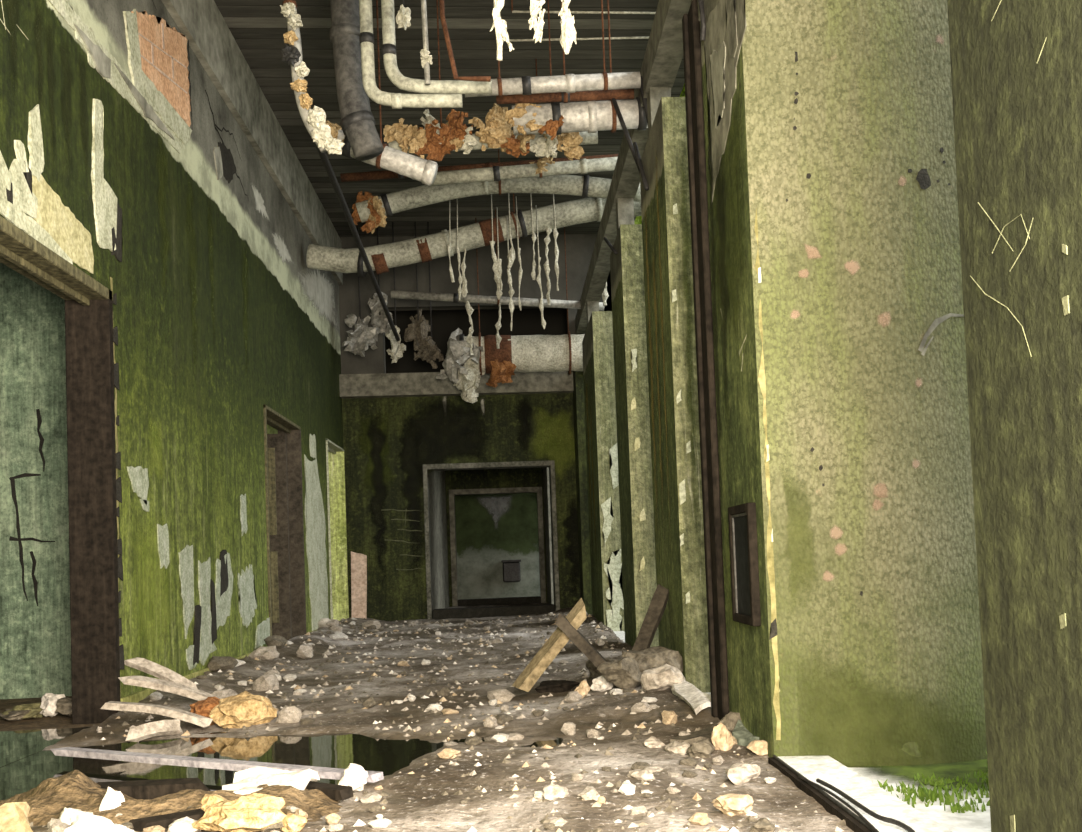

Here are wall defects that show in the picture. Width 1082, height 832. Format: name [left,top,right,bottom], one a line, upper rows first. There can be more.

flaking render [48,0,193,154]
flaking render [0,99,123,274]
flaking render [113,326,149,603]
peeling [157,523,270,670]
peeling [240,494,248,536]
leakage [368,423,387,567]
leakage [400,400,485,575]
leakage [481,496,510,523]
leakage [563,500,580,590]
peeling [601,443,624,631]